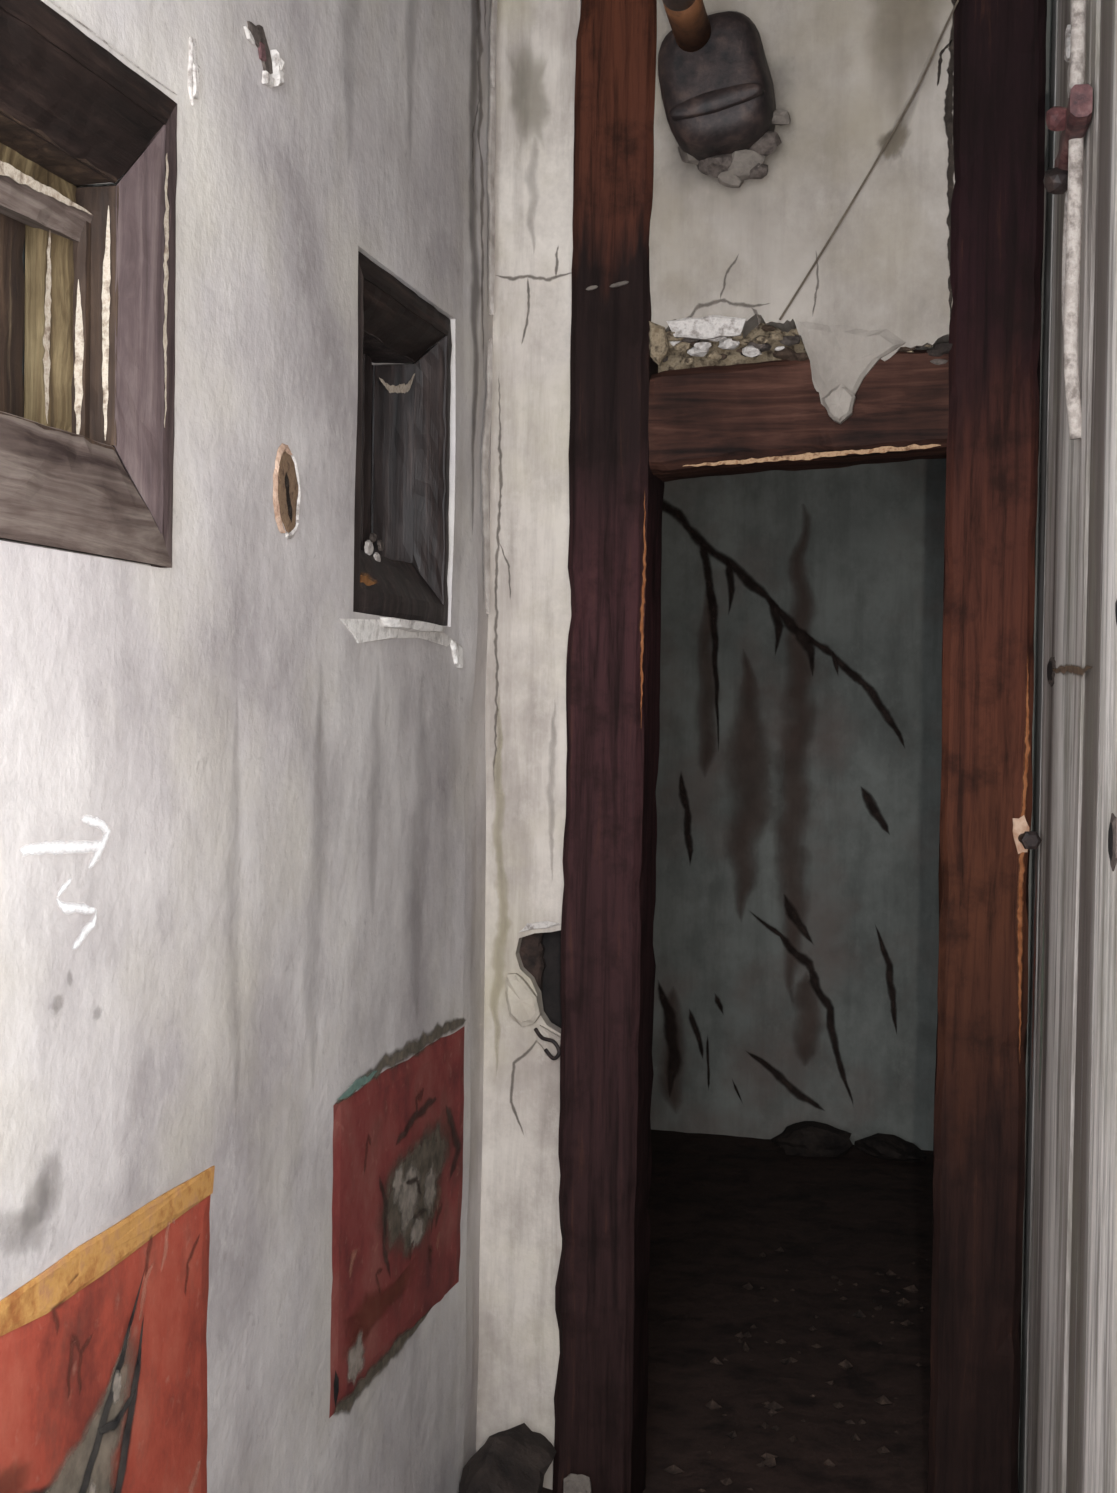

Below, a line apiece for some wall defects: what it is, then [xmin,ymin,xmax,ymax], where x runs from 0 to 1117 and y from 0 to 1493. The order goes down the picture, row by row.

flaking render [49,0,200,105]
flaking render [243,21,285,88]
flaking render [649,315,952,424]
flaking render [273,443,300,539]
crack [662,500,904,747]
crack [679,775,693,862]
crack [861,787,889,833]
flaking render [505,921,561,1129]
crack [658,897,853,1110]
crack [876,928,897,1034]